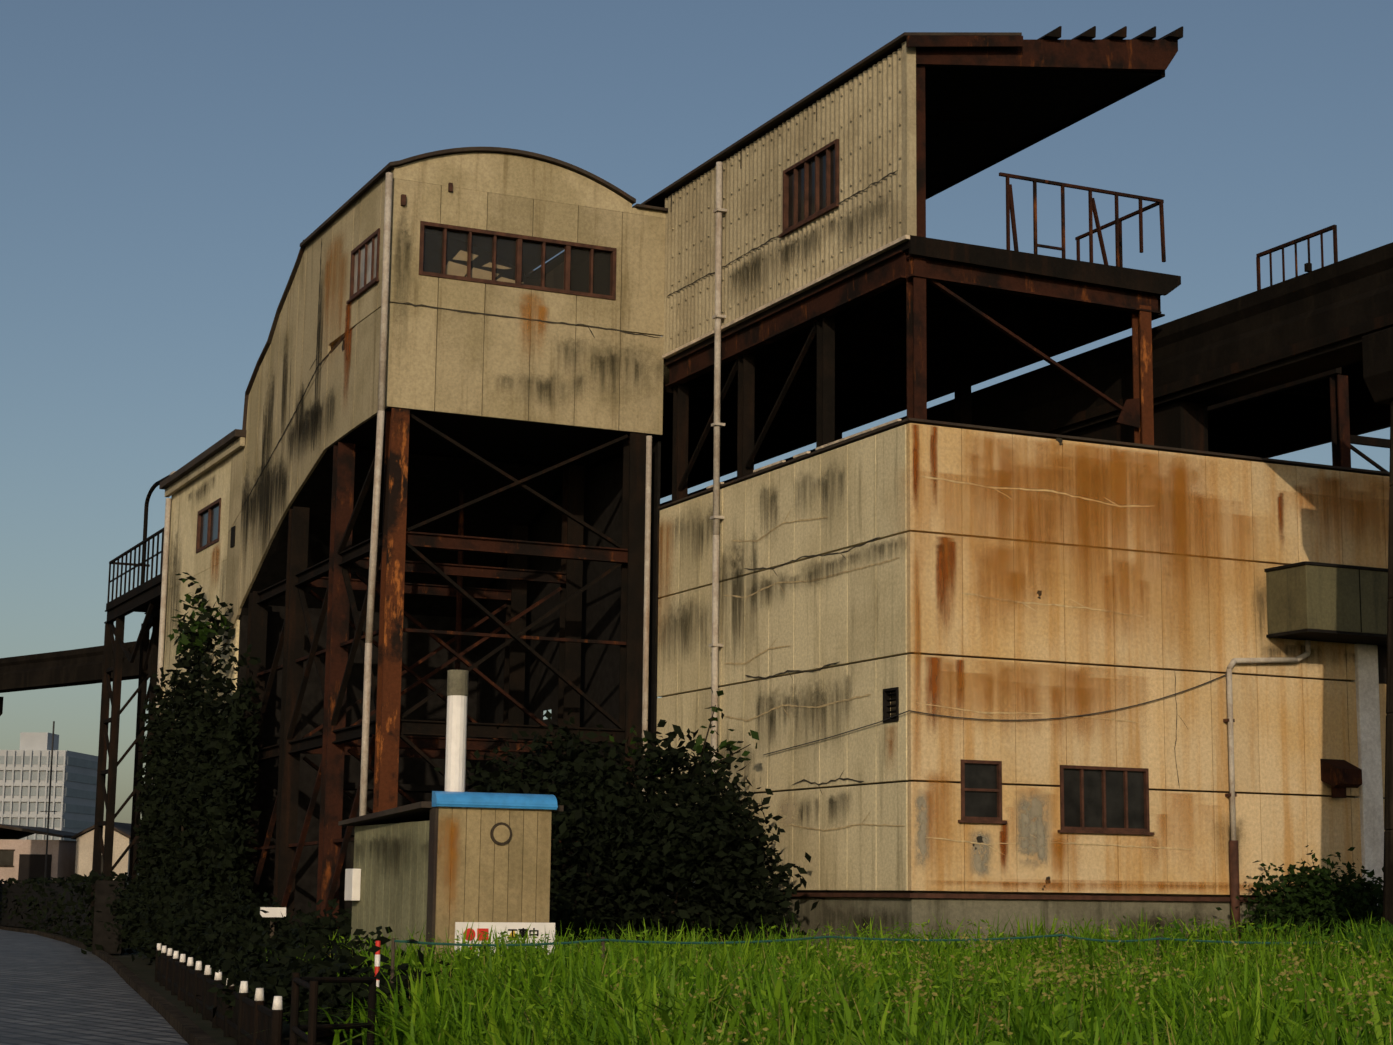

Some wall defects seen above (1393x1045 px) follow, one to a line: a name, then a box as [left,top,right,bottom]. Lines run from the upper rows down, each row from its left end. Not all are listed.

leakage [242,307,333,543]
corrosion [913,425,937,490]
crack [724,510,899,598]
corrosion [937,537,955,603]
crack [724,641,871,722]
corrosion [928,657,940,720]